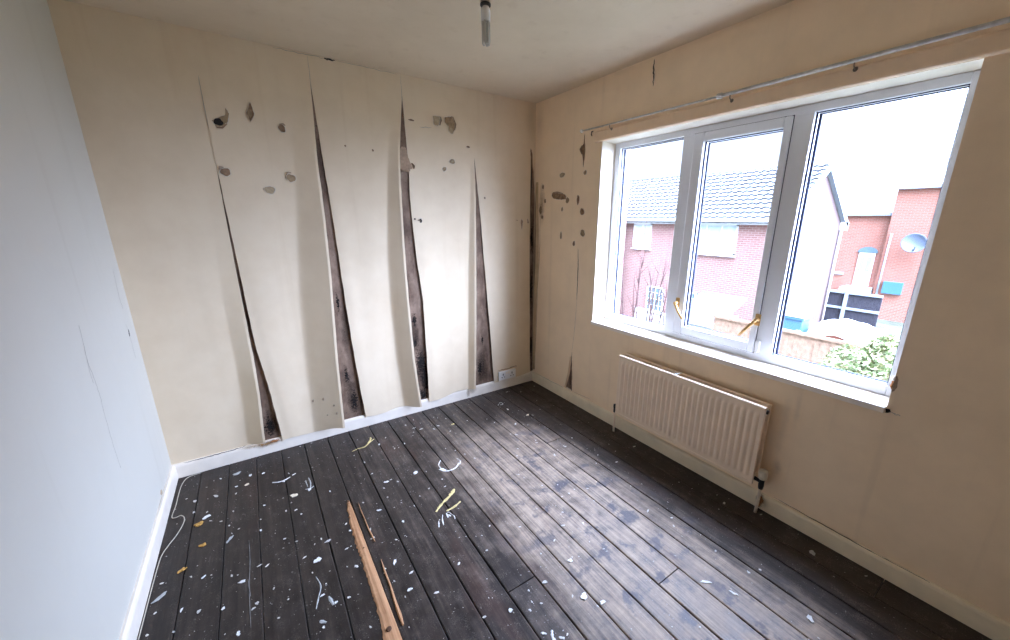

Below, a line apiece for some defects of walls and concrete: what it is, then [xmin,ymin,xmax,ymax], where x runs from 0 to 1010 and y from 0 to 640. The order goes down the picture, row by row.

peeling [198,76,229,129]
flaking render [213,152,282,440]
flaking render [307,57,365,420]
flaking render [400,163,429,400]
peeling [433,115,456,134]
flaking render [474,160,494,385]
peeling [552,192,585,215]